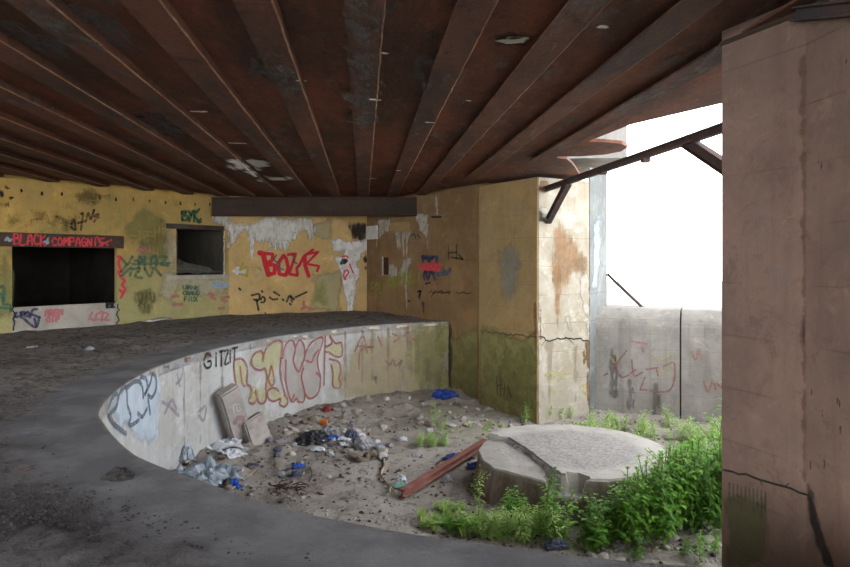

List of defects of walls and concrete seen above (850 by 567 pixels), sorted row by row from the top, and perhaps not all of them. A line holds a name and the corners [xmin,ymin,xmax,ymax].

rust [552,227,586,315]
crack [480,330,589,347]
crack [723,469,807,496]